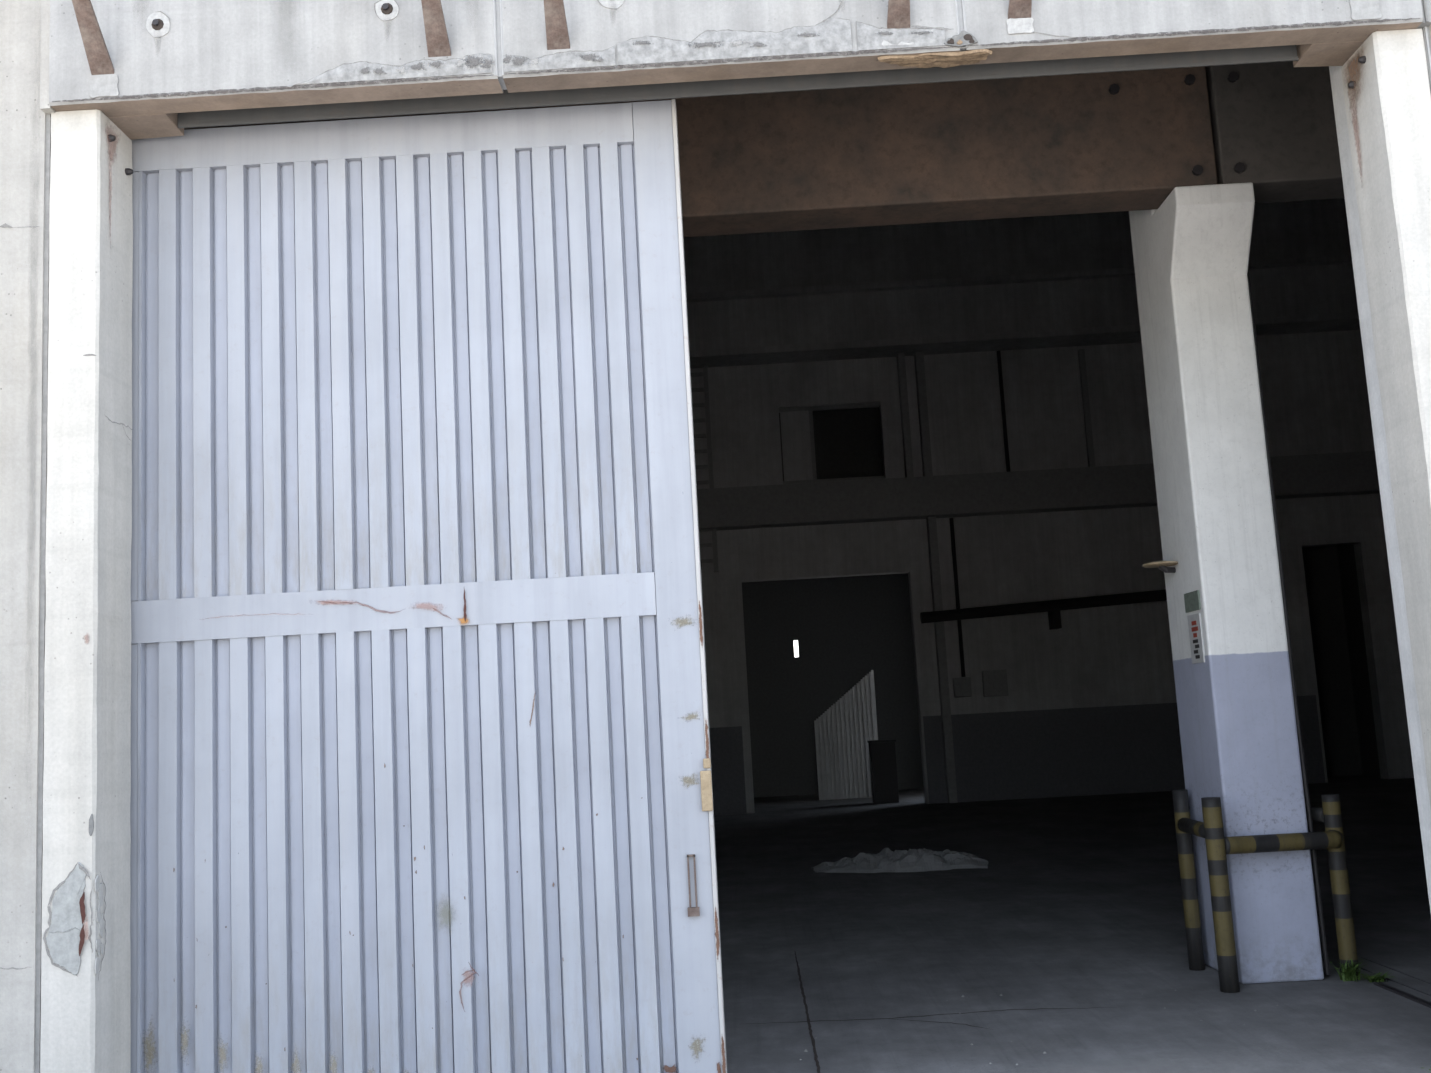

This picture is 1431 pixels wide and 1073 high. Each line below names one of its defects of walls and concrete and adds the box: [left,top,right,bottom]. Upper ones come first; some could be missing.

spalling [287,18,992,87]
spalling [43,862,106,979]
rust [717,1037,726,1073]